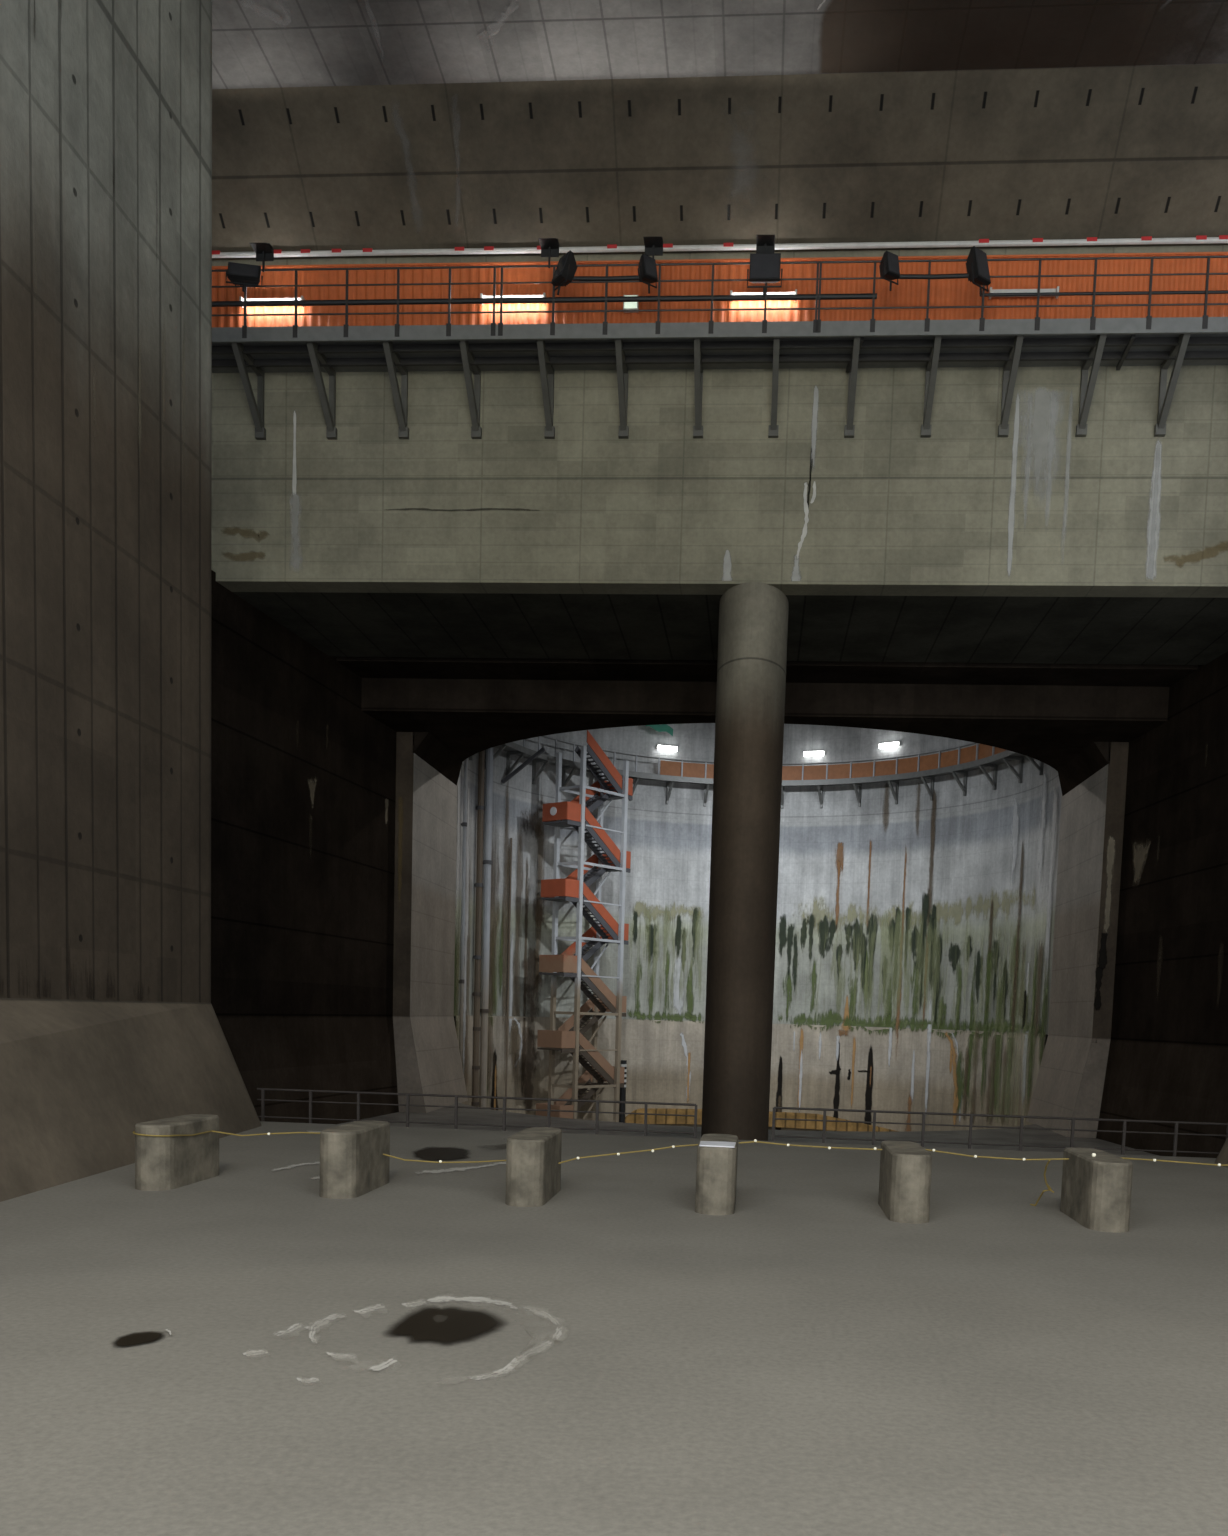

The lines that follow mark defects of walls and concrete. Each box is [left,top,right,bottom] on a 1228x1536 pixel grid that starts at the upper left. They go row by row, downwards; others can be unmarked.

crack [792,386,818,581]
damp [1007,395,1019,576]
damp [243,1296,563,1380]